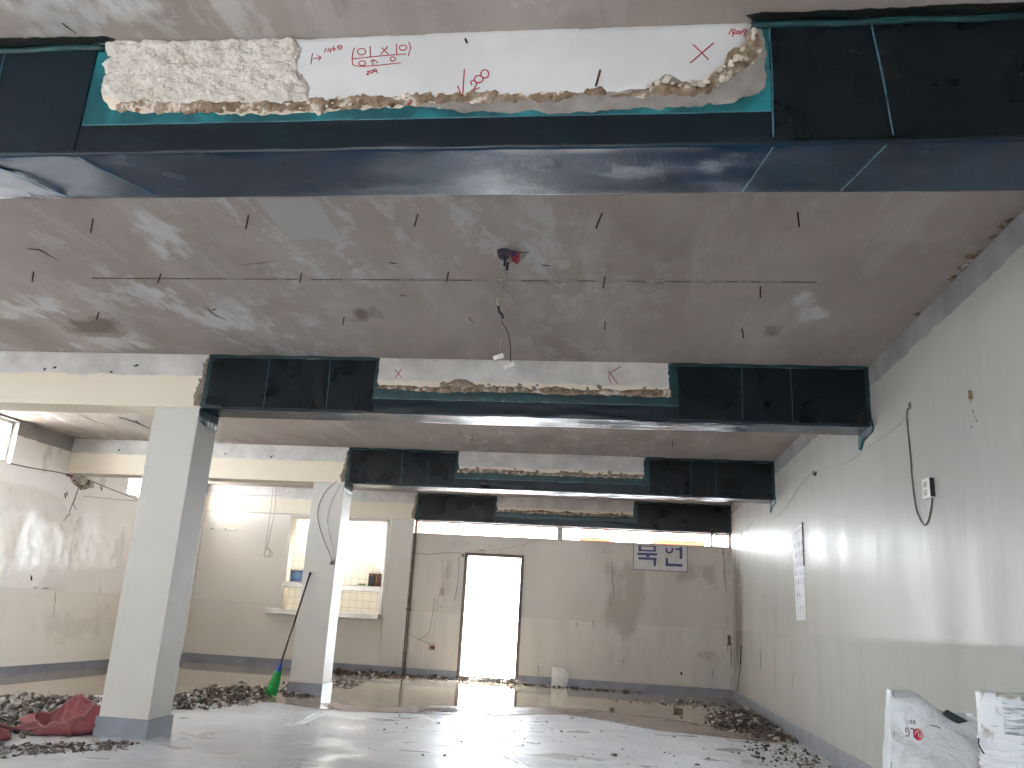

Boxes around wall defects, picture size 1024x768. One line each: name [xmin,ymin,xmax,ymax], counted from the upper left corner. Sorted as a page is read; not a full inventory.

spalling [116,27,763,116]
spalling [946,218,1014,282]
spalling [377,379,671,398]
flaking render [65,474,94,490]
spalling [457,467,645,479]